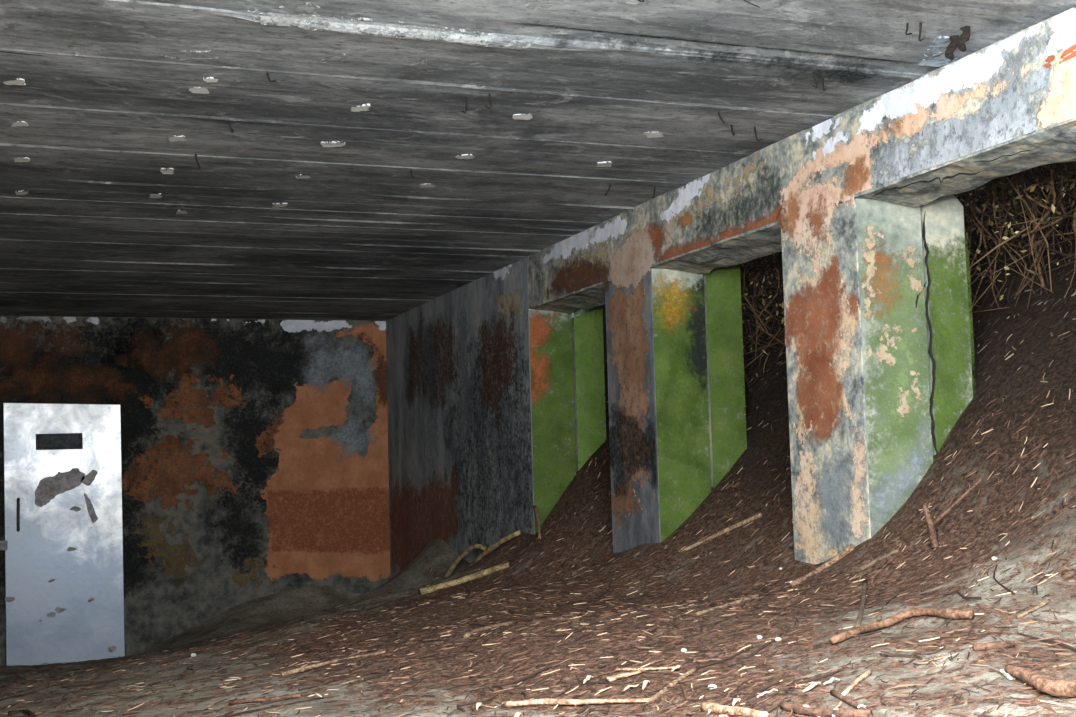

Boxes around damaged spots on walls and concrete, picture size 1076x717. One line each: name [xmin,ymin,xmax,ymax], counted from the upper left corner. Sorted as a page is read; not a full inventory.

crack [873,149,1035,196]
peeling [122,372,246,584]
damp [0,318,378,606]
peeling [232,375,390,588]
peeling [280,320,387,373]
damp [421,311,532,552]
corrosion [784,256,858,442]
corrosion [872,247,898,315]
spalling [778,8,1076,564]
crack [916,214,938,458]